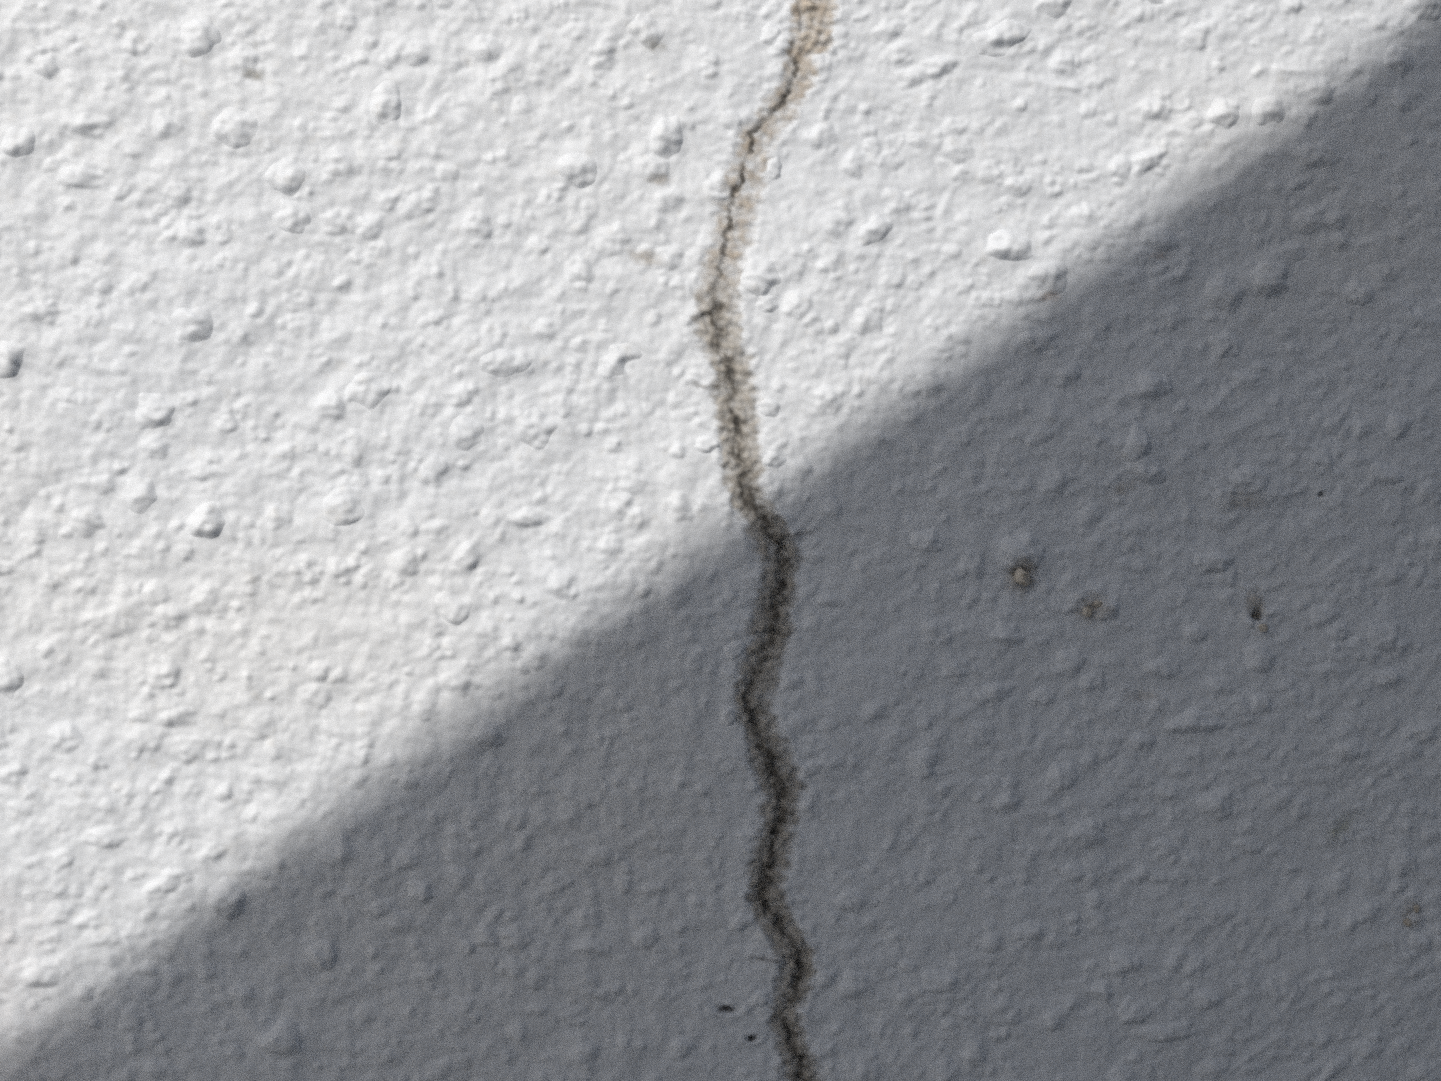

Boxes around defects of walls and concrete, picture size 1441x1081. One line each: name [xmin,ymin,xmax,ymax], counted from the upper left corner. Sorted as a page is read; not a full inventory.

crack [693,0,837,1081]